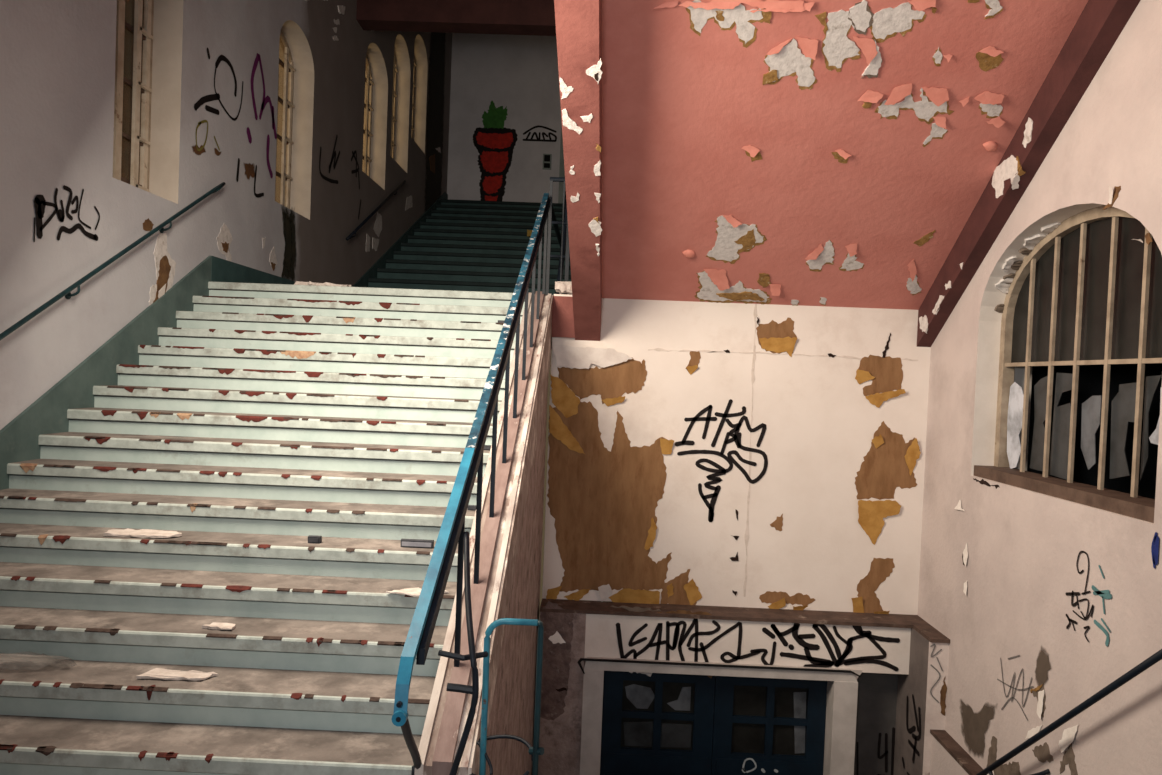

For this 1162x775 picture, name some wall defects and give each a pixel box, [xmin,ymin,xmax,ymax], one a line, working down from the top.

peeling [586,58,602,83]
peeling [652,0,1005,147]
peeling [559,77,593,134]
peeling [695,215,799,357]
peeling [234,299,420,339]
peeling [119,348,356,377]
peeling [218,390,335,399]
peeling [235,415,396,426]
peeling [855,333,906,408]
peeling [540,344,712,721]
peeling [851,421,921,614]
peeling [32,668,219,700]